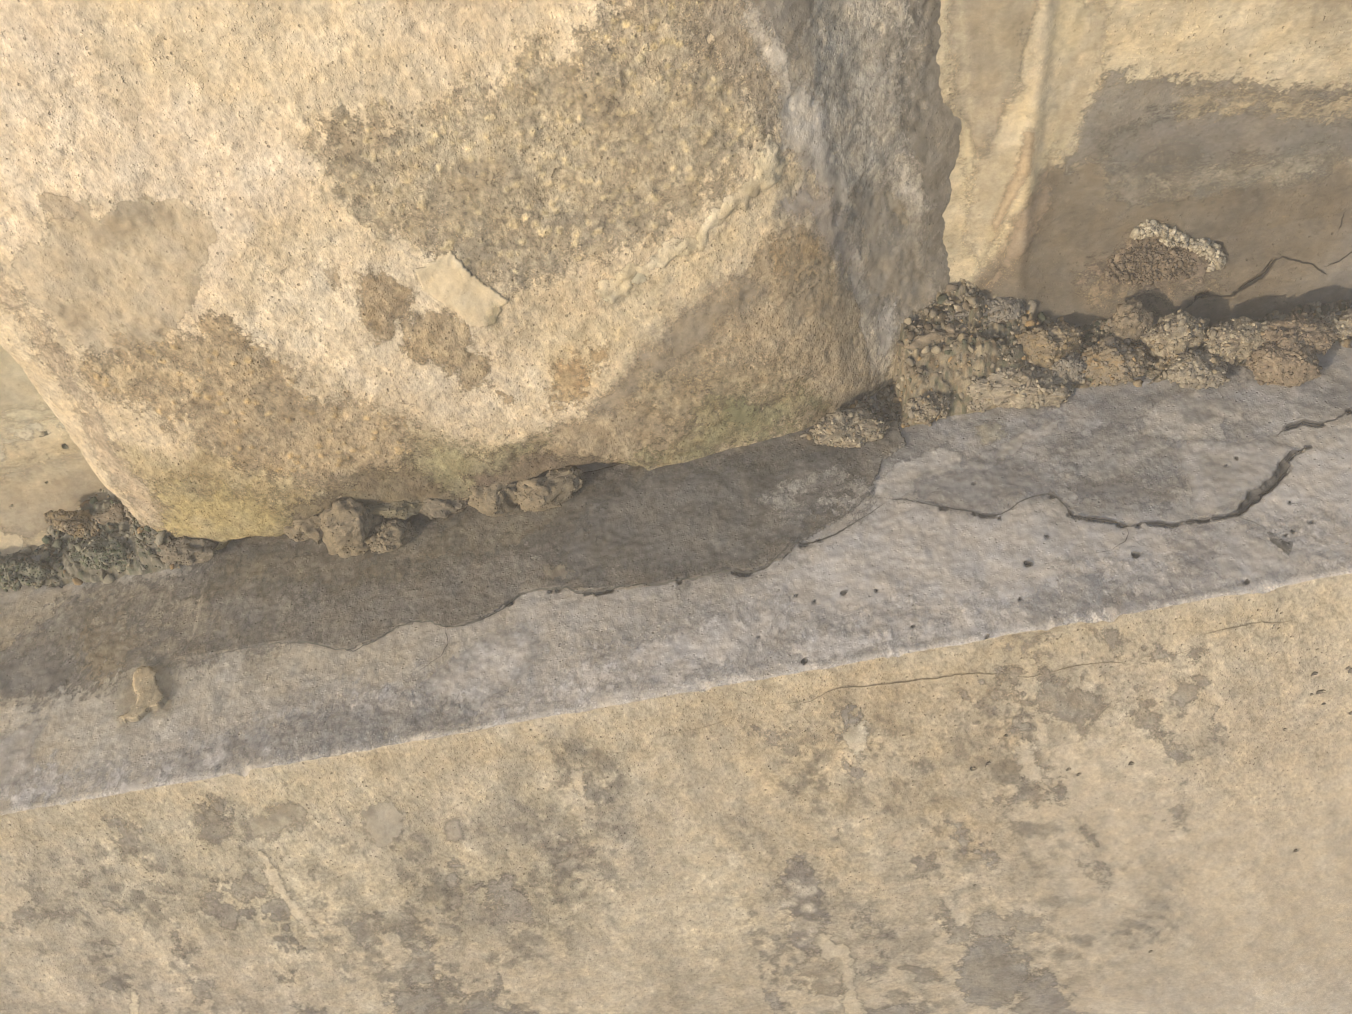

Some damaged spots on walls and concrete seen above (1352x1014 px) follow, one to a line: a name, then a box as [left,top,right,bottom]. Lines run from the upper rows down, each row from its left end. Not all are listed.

flaking render [0,191,1113,716]
crack [181,407,1352,672]
damp [284,0,1352,527]
spalling [1129,340,1176,387]
crack [1183,211,1352,310]